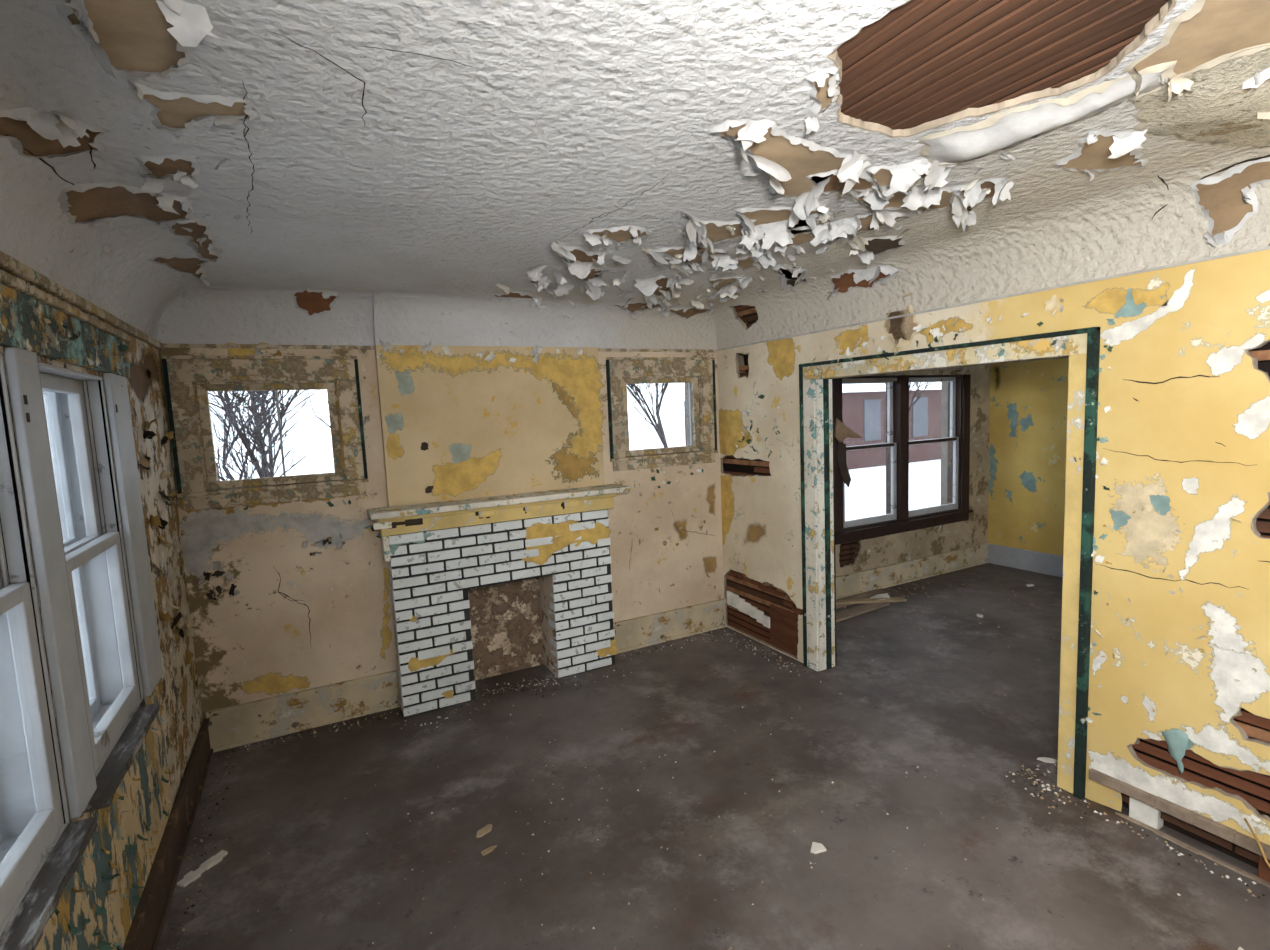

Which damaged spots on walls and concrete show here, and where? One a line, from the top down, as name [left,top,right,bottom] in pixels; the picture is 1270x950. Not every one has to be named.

peeling [55,0,261,130]
peeling [0,106,110,158]
peeling [57,154,223,287]
crack [242,81,255,233]
spalling [490,0,1270,330]
peeling [1082,269,1196,372]
peeling [425,443,502,497]
peeling [362,340,606,487]
peeling [1091,437,1270,595]
spalling [707,569,803,659]
peeling [1086,599,1270,888]
peeling [54,825,158,950]